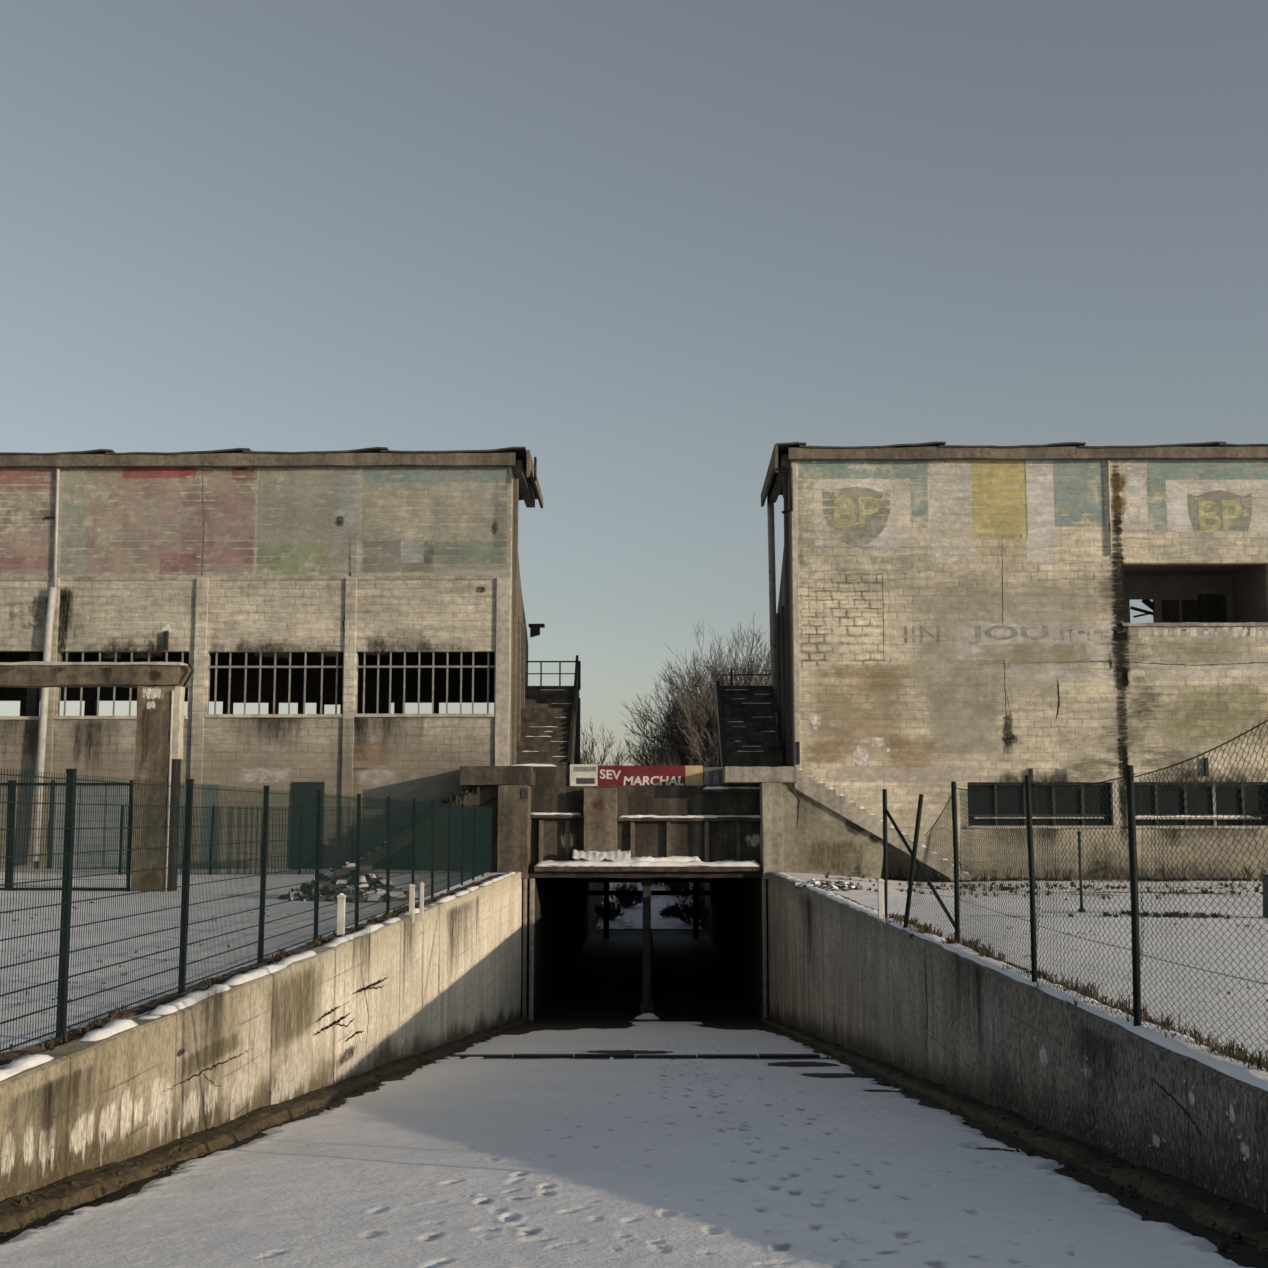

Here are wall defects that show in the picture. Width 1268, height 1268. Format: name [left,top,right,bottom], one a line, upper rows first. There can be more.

damp [1112,466,1130,830]
crack [315,974,388,1059]
damp [329,1030,375,1084]